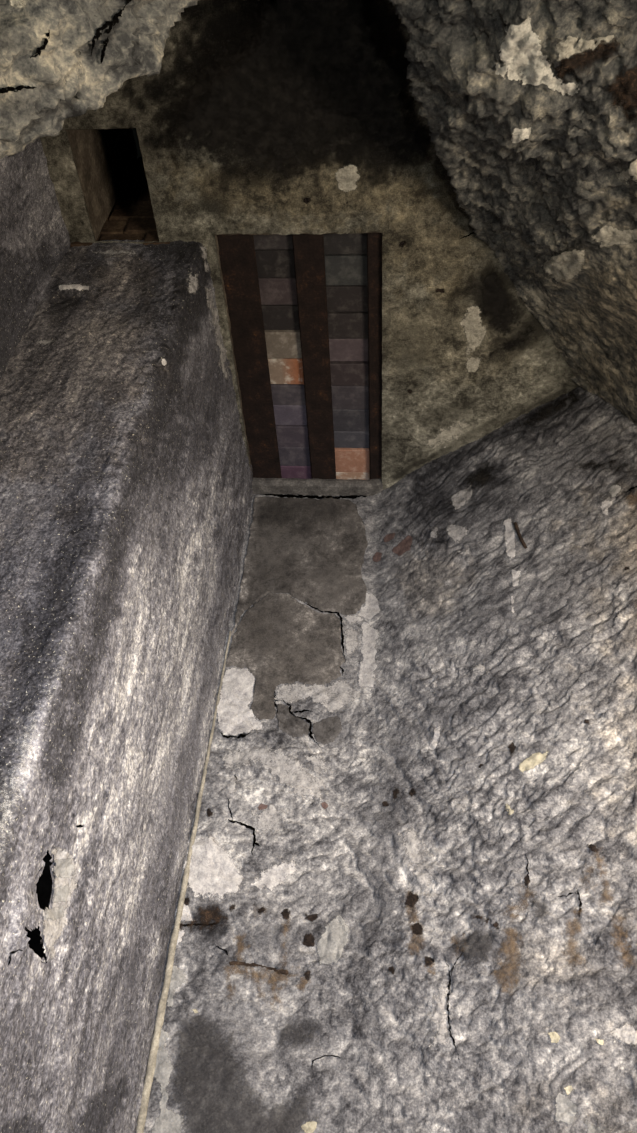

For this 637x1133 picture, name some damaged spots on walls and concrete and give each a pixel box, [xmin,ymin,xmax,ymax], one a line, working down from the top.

crack [0,85,36,93]
crack [30,31,50,58]
crack [90,0,132,63]
spalling [495,17,614,96]
corrosion [557,41,620,81]
corrosion [605,66,637,123]
spalling [618,159,637,185]
crack [300,600,346,675]
spalling [217,668,329,801]
spalling [252,805,285,833]
spalling [25,847,77,963]
leakage [173,1017,307,1133]